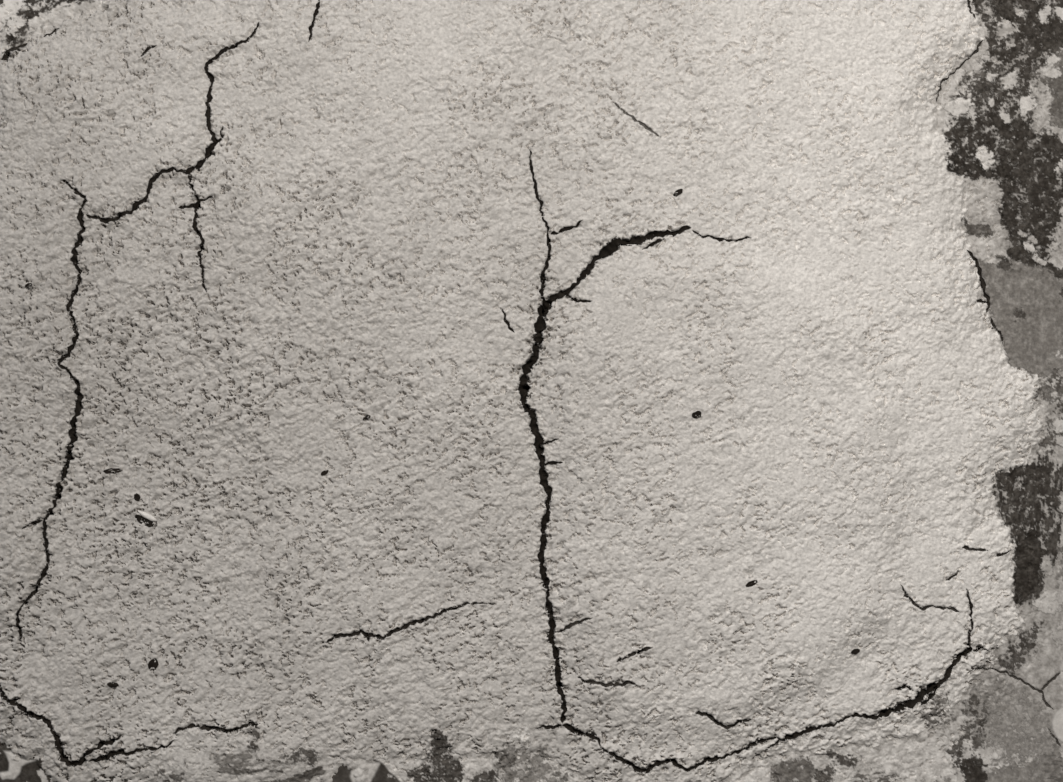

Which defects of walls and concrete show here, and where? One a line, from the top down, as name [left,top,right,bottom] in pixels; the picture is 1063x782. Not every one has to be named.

crack [1,28,59,60]
crack [308,0,320,42]
crack [16,22,259,643]
crack [500,150,1061,774]
crack [327,602,495,642]
crack [0,686,259,767]